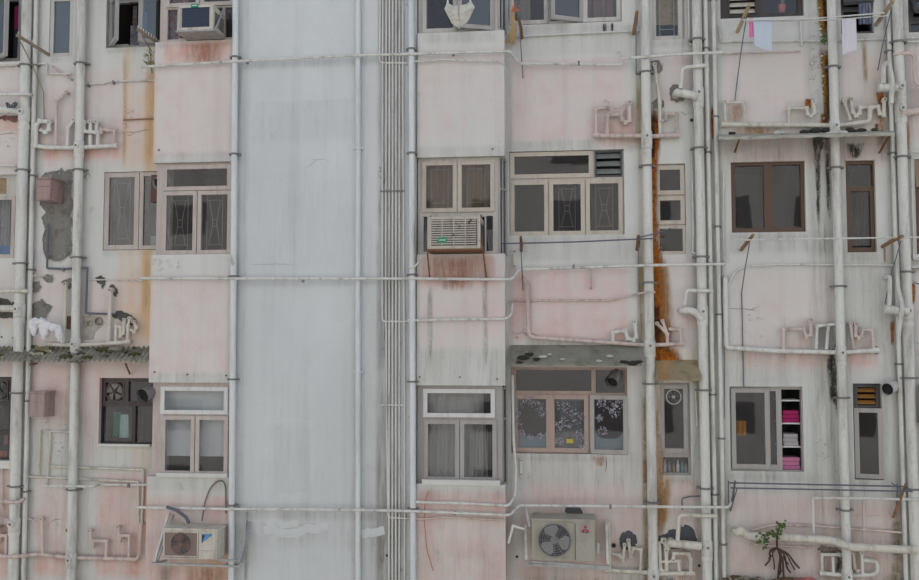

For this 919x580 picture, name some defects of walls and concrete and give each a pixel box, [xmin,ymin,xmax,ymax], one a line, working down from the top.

corrosion [818,0,827,34]
corrosion [821,52,830,123]
spalling [39,167,73,264]
corrosion [651,114,679,360]
spalling [0,297,14,319]
spalling [32,274,72,319]
spalling [95,274,119,298]
spalling [82,310,138,341]
corrosion [658,458,669,527]